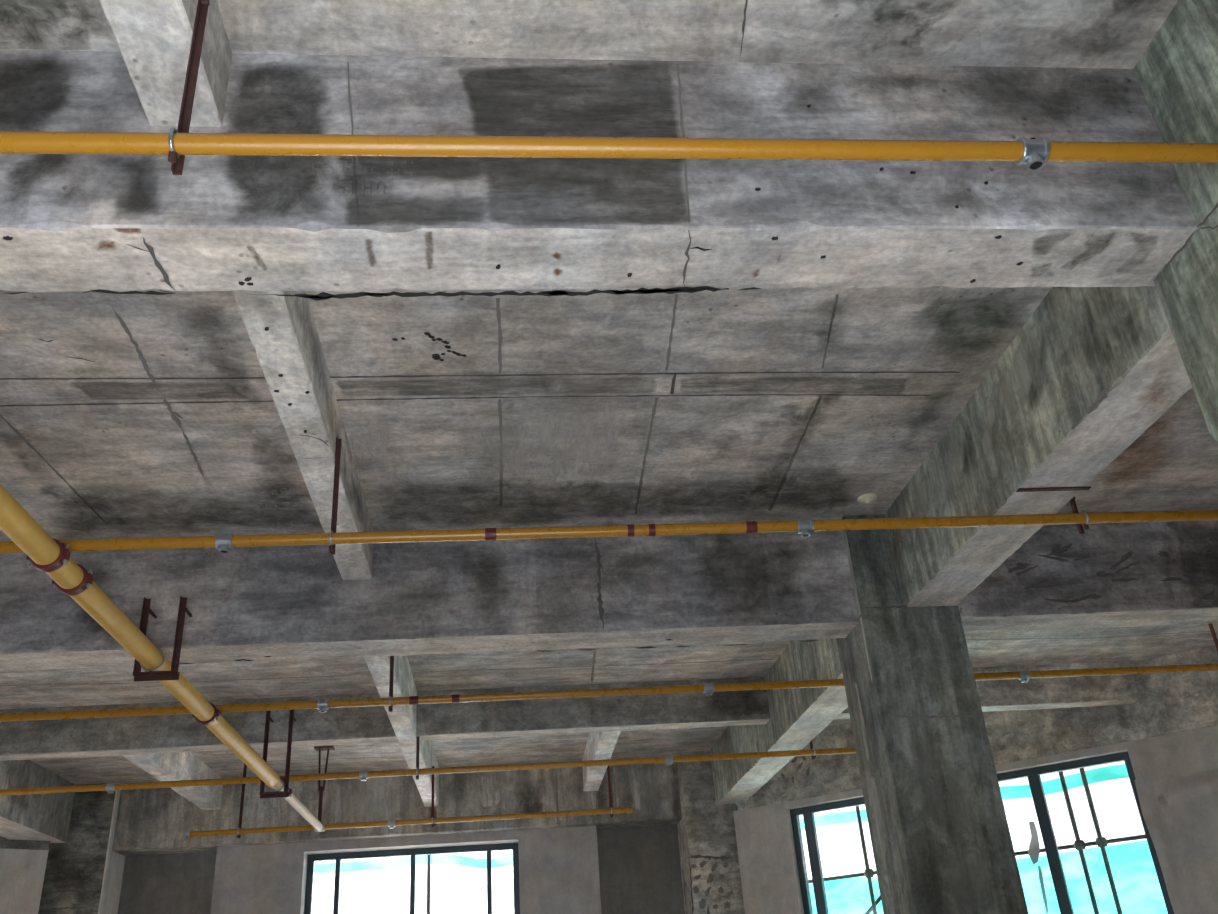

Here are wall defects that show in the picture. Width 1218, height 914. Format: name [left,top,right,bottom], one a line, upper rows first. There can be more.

crack [83,238,205,481]
crack [253,230,761,301]